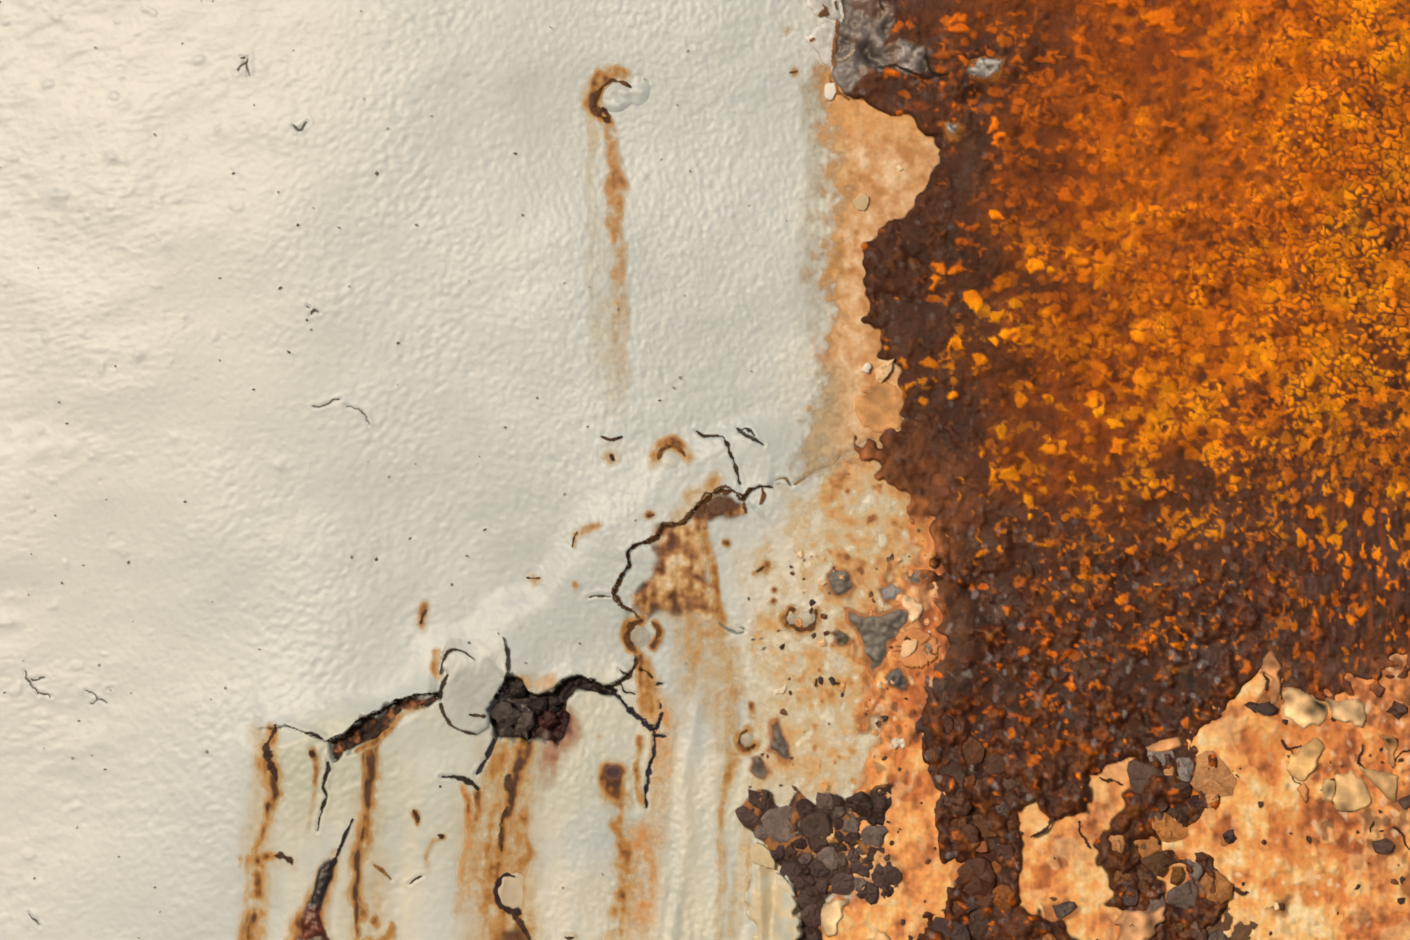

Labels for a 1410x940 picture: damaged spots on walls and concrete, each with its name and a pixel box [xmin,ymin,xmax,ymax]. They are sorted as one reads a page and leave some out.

crack [695,427,764,485]
corrosion [717,0,1410,940]
peeling [826,566,928,690]
crack [288,726,331,831]
corrosion [286,743,395,940]
crack [441,734,499,791]
corrosion [458,737,536,940]
corrosion [598,651,671,940]
crack [609,656,666,808]
peeling [750,718,791,779]
peeling [744,842,803,940]
peeling [1244,650,1410,812]